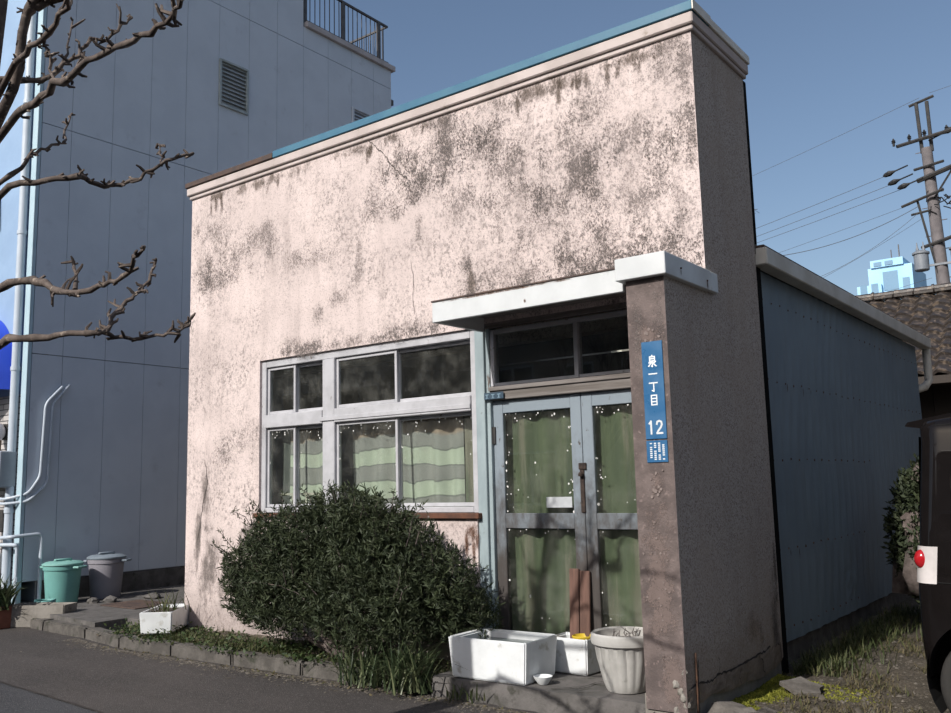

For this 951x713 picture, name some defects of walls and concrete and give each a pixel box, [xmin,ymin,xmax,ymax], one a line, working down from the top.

leakage [350,37,703,296]
leakage [194,192,276,293]
leakage [282,321,445,358]
leakage [196,516,223,591]